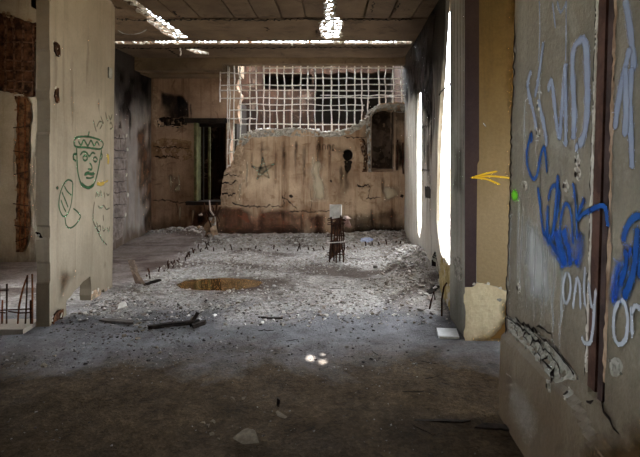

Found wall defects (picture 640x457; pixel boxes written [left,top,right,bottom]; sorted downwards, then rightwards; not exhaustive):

spalling [0,11,36,252]
water stain [118,71,148,116]
water stain [137,128,152,232]
water stain [161,93,187,120]
spalling [219,66,405,207]
crack [505,0,618,383]